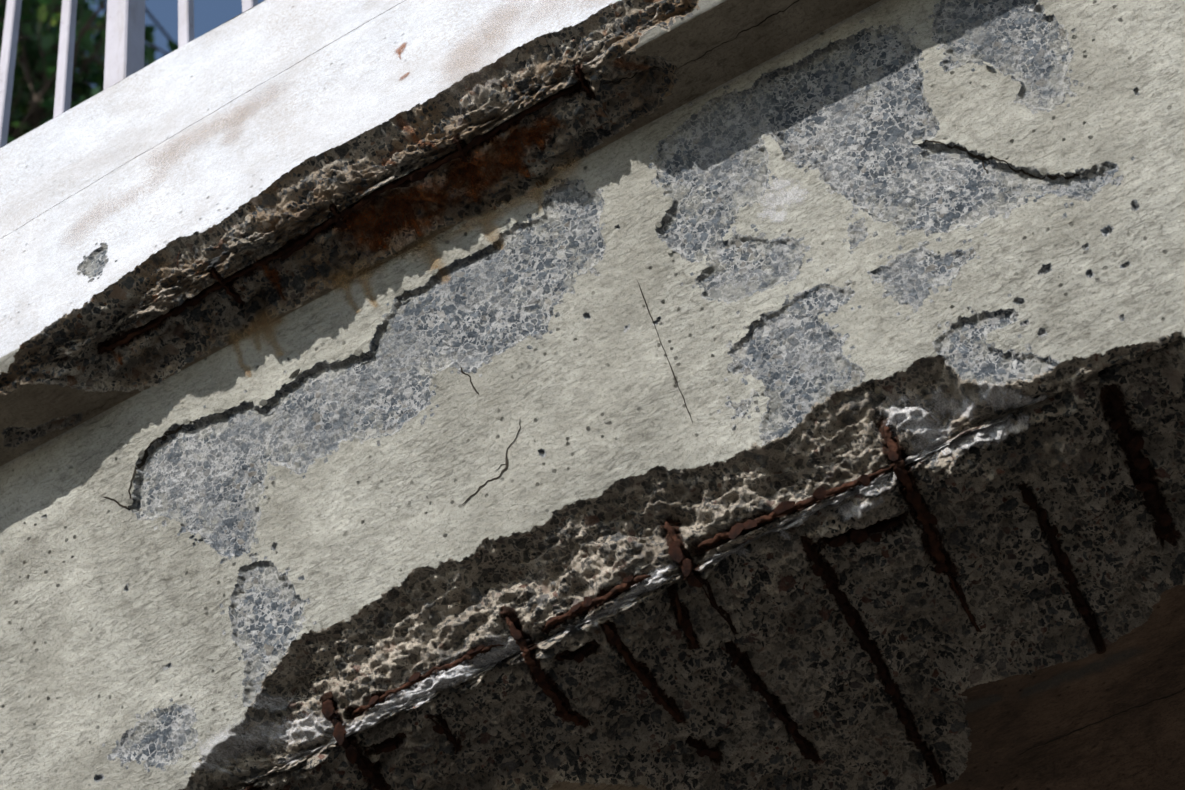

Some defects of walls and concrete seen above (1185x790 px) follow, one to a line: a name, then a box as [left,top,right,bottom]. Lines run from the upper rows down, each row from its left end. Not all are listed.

corrosion [97,63,596,365]
spalling [0,0,700,564]
crack [638,283,693,423]
crack [600,0,799,86]
peeling [648,19,1124,320]
crack [918,140,1085,180]
peeling [928,0,1084,114]
corrosion [319,570,656,790]
crack [462,422,521,505]
corrosion [554,620,724,768]
spalling [179,280,1185,790]
corrosion [660,411,982,788]